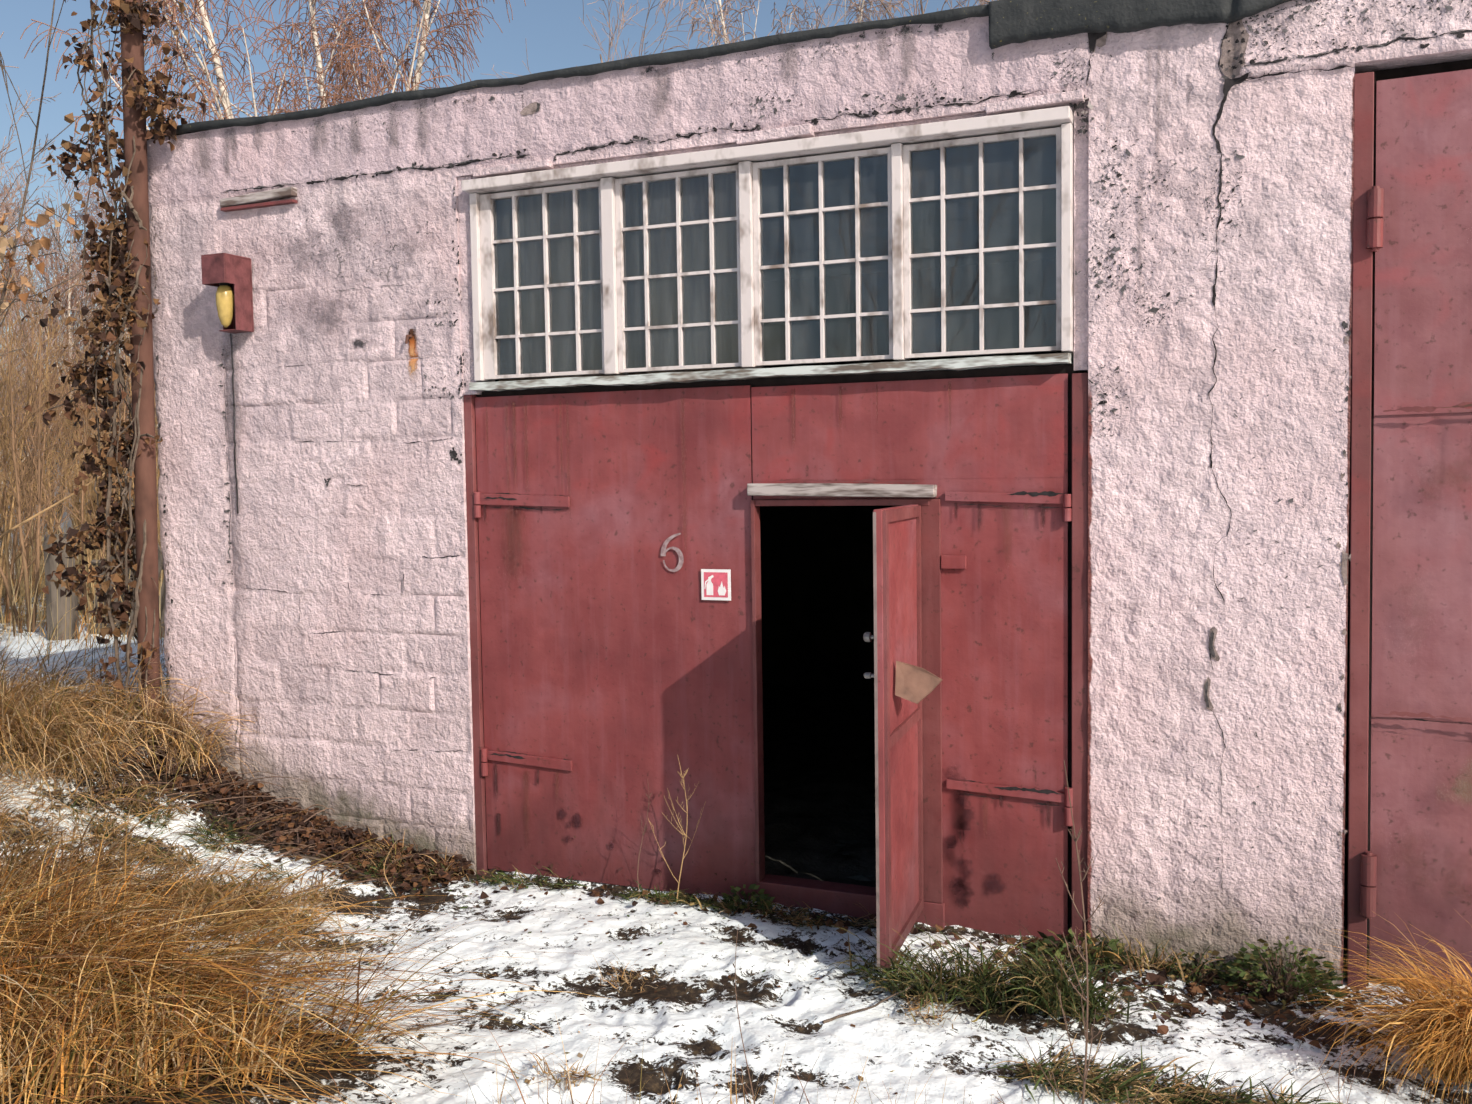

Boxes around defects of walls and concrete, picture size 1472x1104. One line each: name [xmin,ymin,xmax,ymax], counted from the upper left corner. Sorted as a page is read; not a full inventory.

crack [805,90,1041,125]
crack [223,122,761,193]
rust [405,329,418,374]
crack [1198,28,1472,675]
crack [1214,714,1227,934]